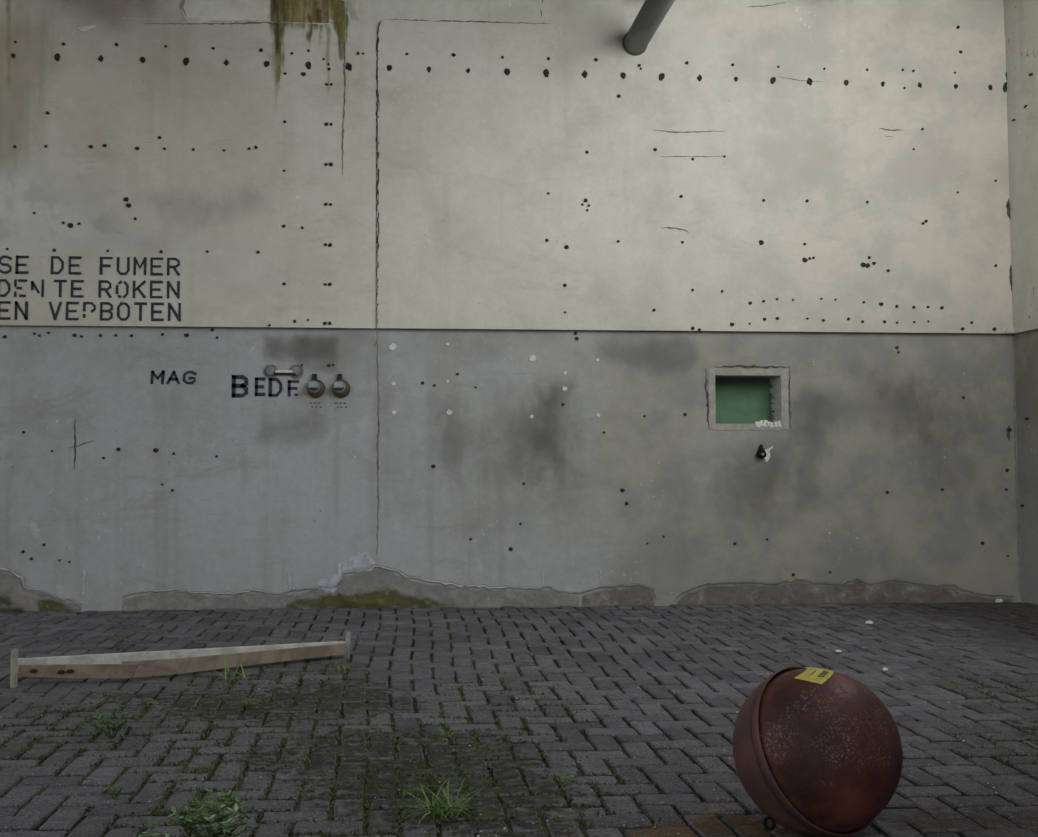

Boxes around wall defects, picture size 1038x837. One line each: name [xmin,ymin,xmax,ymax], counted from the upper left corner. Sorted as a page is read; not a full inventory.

damp [271,0,348,82]
efflorescence [314,553,376,593]